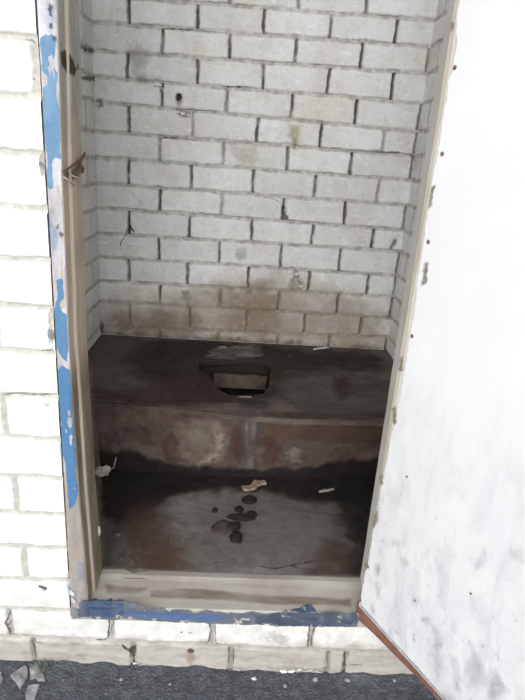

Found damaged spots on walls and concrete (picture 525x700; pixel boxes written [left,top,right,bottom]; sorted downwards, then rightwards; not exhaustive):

damp [151,286,373,348]
corrosion [267,426,383,440]
damp [94,422,378,575]